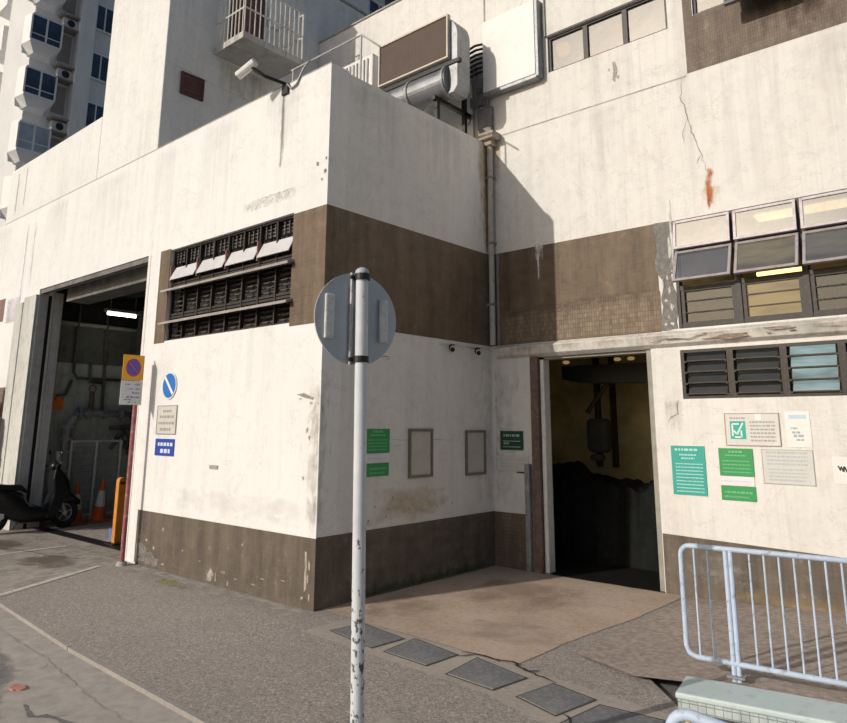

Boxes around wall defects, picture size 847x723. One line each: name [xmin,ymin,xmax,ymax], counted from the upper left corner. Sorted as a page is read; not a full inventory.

crack [679,81,706,169]
peeling [503,221,678,344]
crack [458,652,556,683]